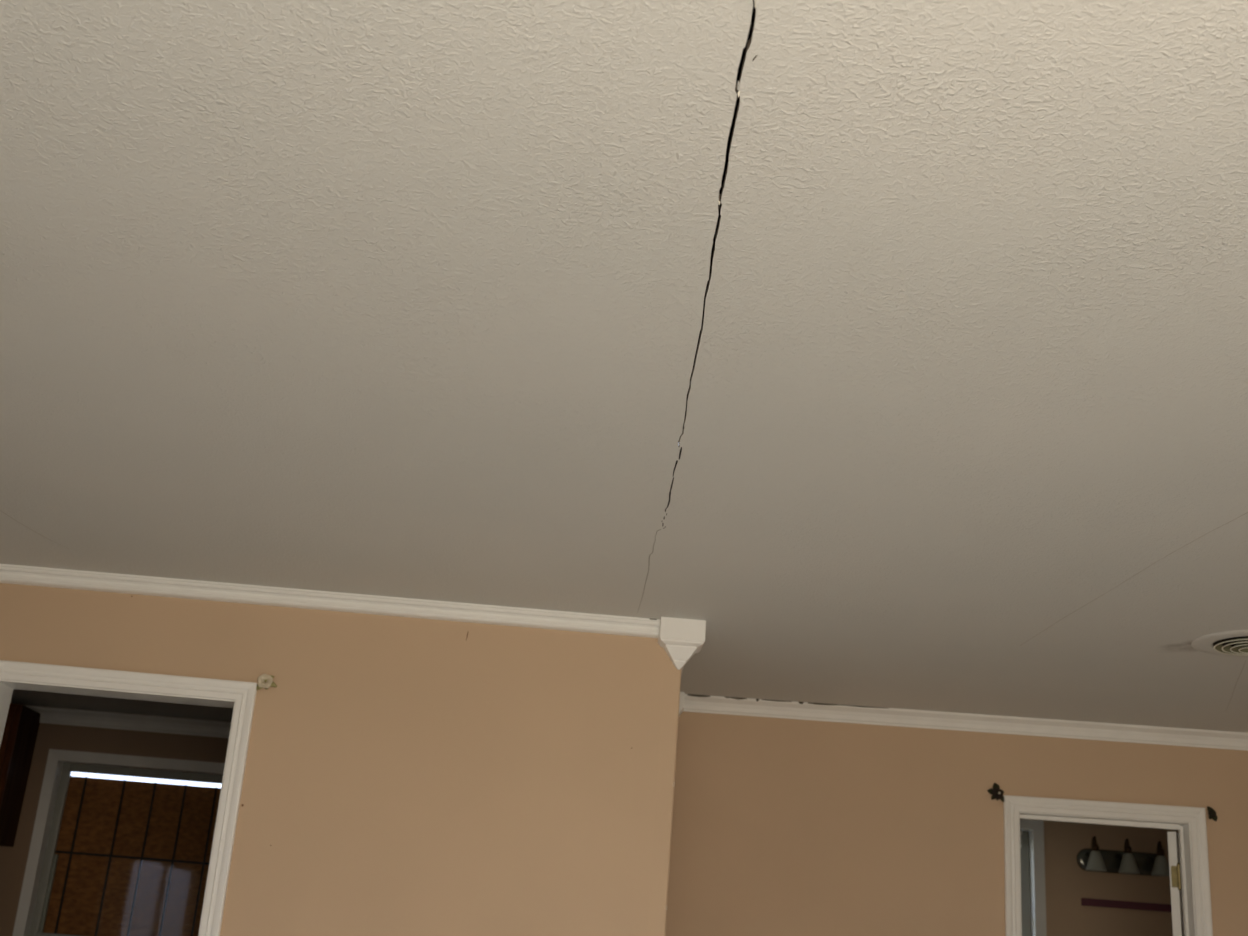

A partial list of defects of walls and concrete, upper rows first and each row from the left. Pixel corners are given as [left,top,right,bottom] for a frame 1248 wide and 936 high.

crack [637,0,760,620]